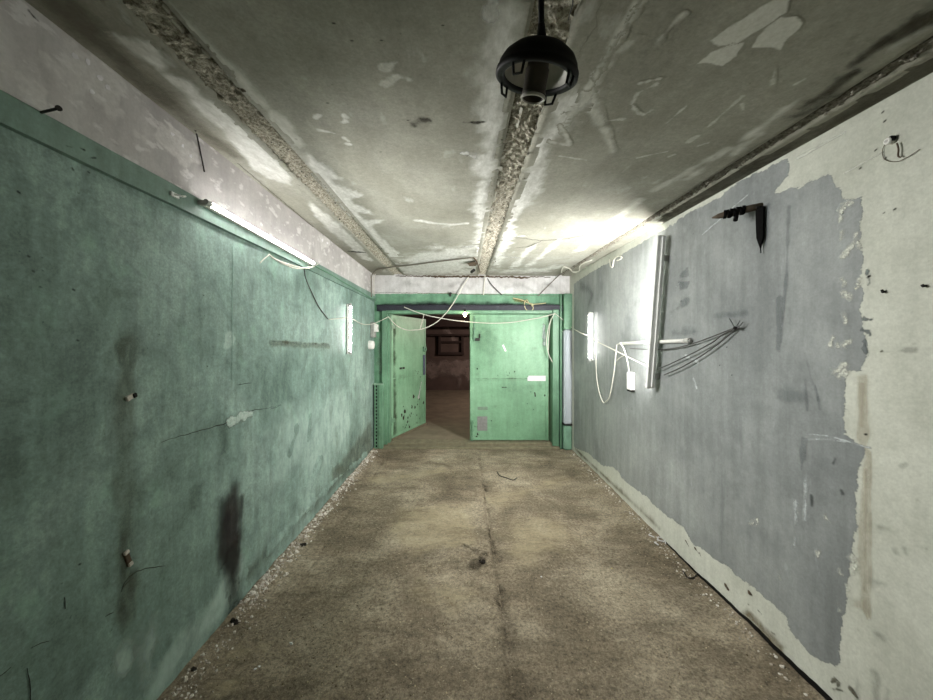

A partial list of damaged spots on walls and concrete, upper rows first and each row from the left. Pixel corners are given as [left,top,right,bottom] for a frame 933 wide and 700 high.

spalling [527,0,581,44]
spalling [123,0,403,275]
spalling [477,93,544,275]
peeling [860,317,872,354]
flaking render [226,411,253,428]